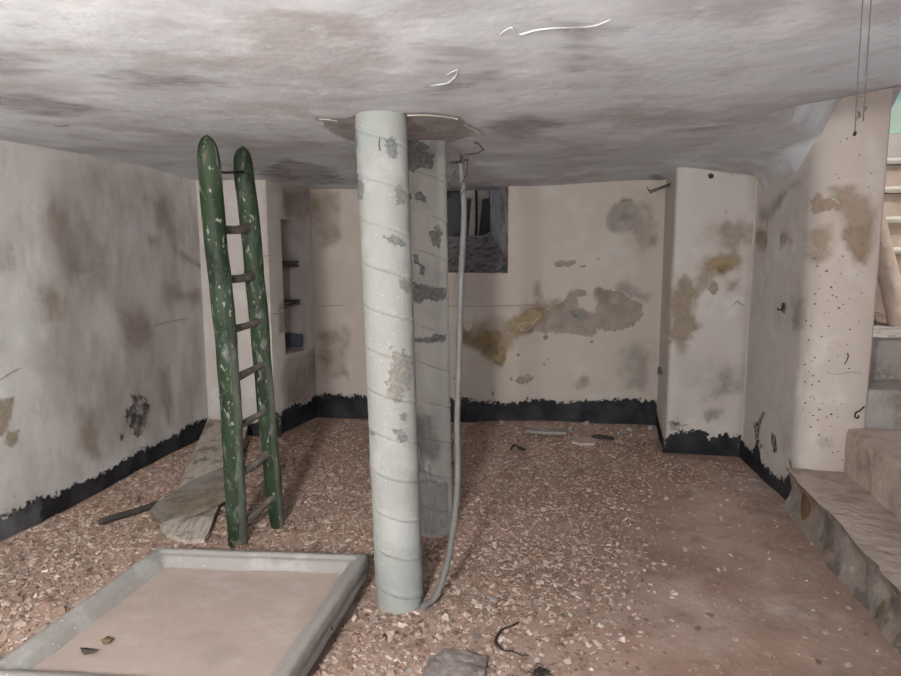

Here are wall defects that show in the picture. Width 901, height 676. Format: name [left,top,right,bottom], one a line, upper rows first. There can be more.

peeling [809,192,839,215]
spalling [399,254,446,305]
peeling [506,286,644,343]
spalling [414,334,446,343]
spalling [385,346,412,402]
water stain [120,394,150,439]
spalling [393,413,407,446]